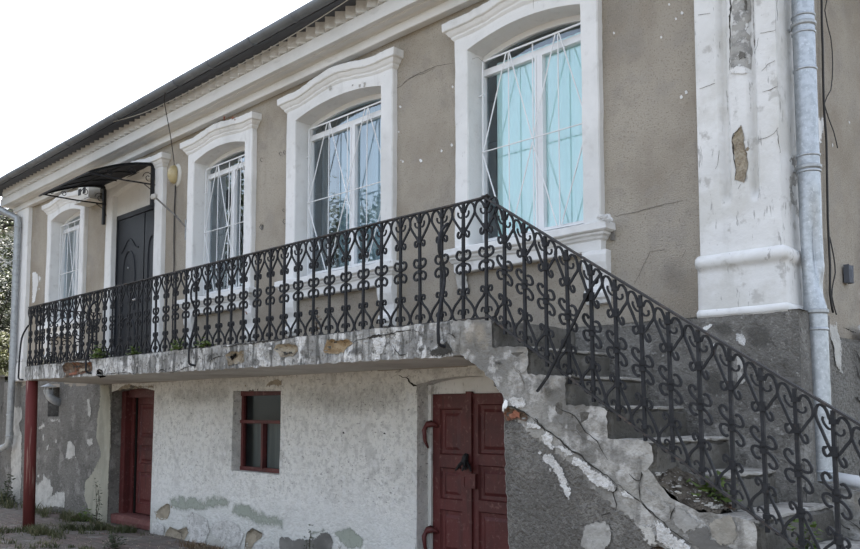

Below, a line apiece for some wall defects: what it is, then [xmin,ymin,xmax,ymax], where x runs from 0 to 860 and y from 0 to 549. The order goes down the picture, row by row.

flaking render [730,0,752,74]
flaking render [732,125,750,182]
spalling [62,362,92,379]
spalling [225,351,244,366]
spalling [257,344,298,367]
spalling [323,339,353,354]
peeling [39,419,76,459]
peeling [502,396,634,500]
peeling [35,474,65,509]
crack [527,406,692,545]
peeling [154,504,274,549]
peeling [639,488,701,549]